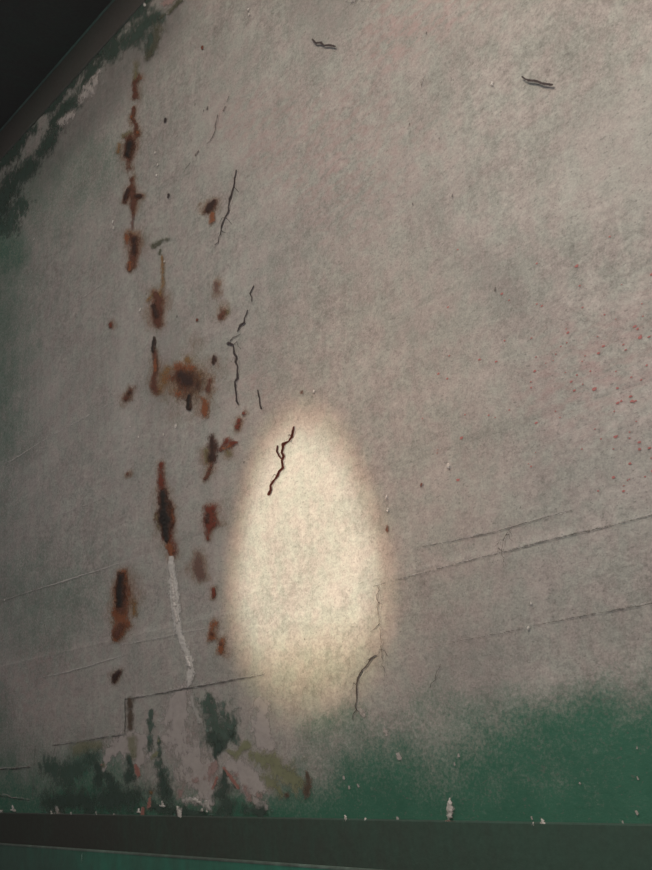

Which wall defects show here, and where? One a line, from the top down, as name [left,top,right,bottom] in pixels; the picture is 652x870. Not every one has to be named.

rust [117,62,144,272]
crack [215,170,238,245]
rust [146,255,212,417]
crack [227,286,262,409]
rust [154,462,176,558]
rust [203,412,245,480]
crack [267,426,294,496]
rust [111,569,137,642]
efflorescence [168,556,202,723]
crack [352,586,388,720]
peeling [100,729,152,778]
peeling [160,685,272,818]